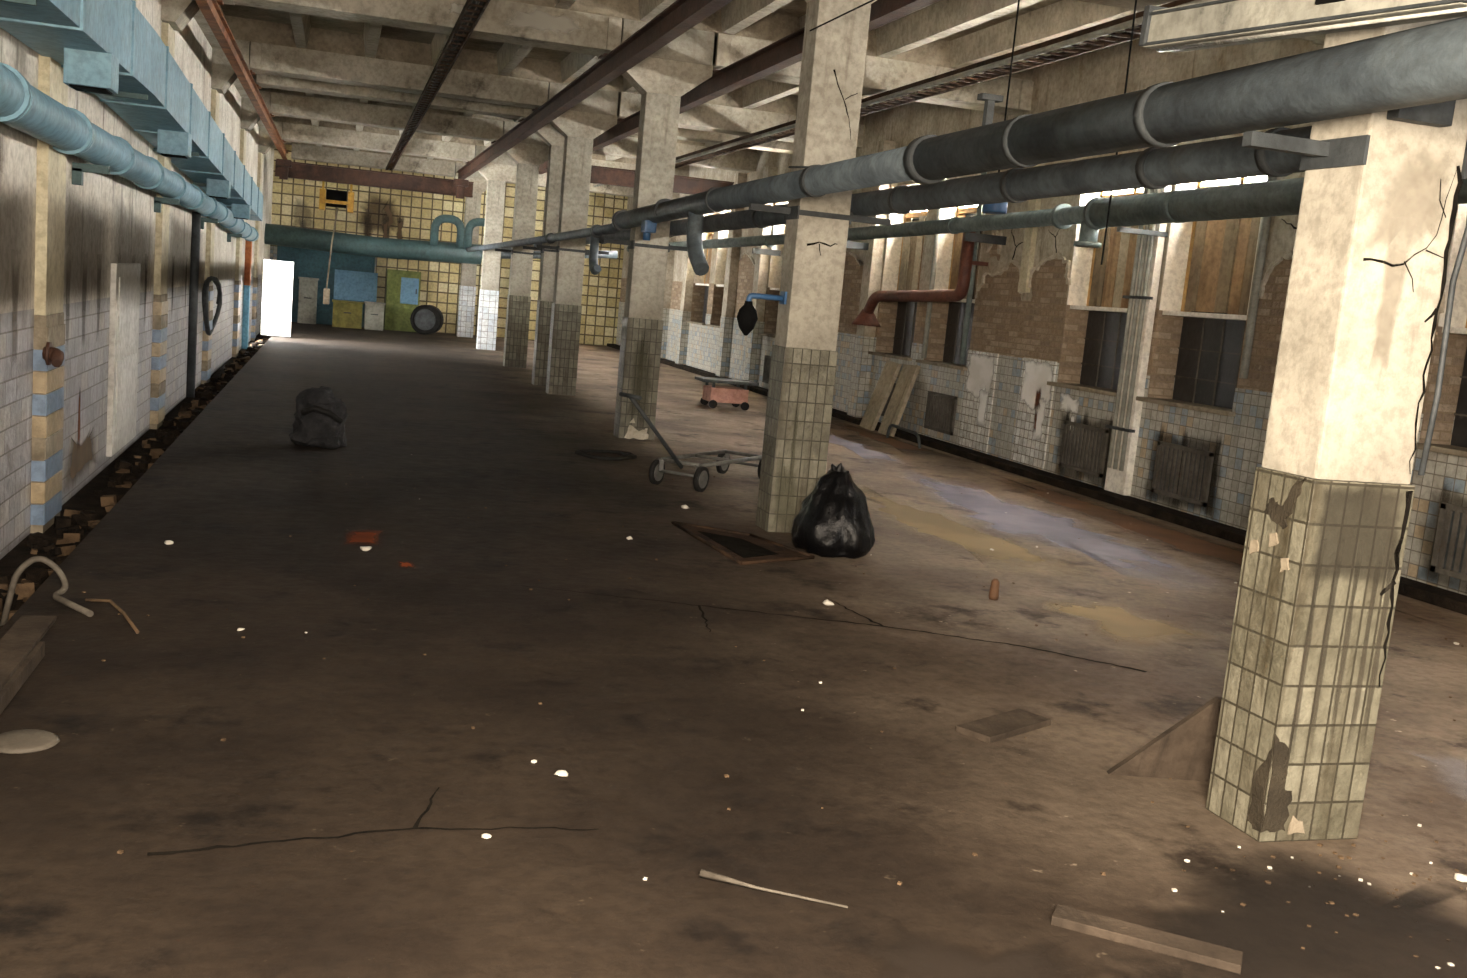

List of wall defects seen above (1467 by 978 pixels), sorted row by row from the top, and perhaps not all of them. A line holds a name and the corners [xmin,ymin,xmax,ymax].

spalling [976,230,1071,307]
spalling [1249,477,1307,573]
peeling [1246,734,1305,835]